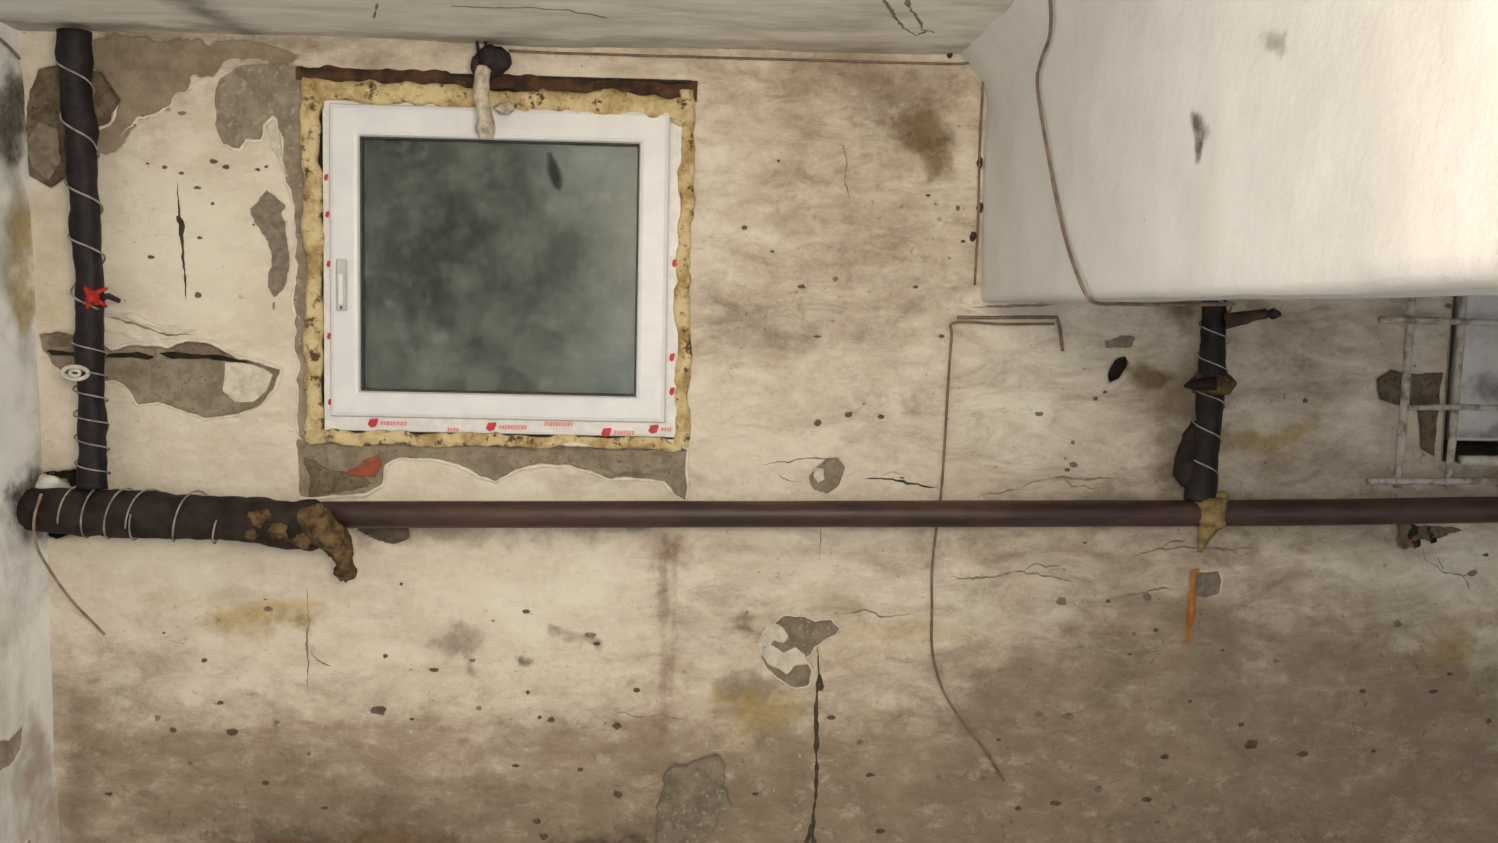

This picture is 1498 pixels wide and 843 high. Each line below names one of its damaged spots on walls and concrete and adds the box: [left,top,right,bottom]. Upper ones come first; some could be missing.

crack [882,0,934,36]
damp [0,75,26,163]
flaking render [26,65,66,188]
damp [897,104,950,175]
crack [176,181,186,297]
flaking render [91,32,690,501]
flaking render [39,331,77,382]
flaking render [1377,370,1443,456]
peeling [759,614,840,689]
crack [804,646,824,843]
flaking render [579,754,732,843]